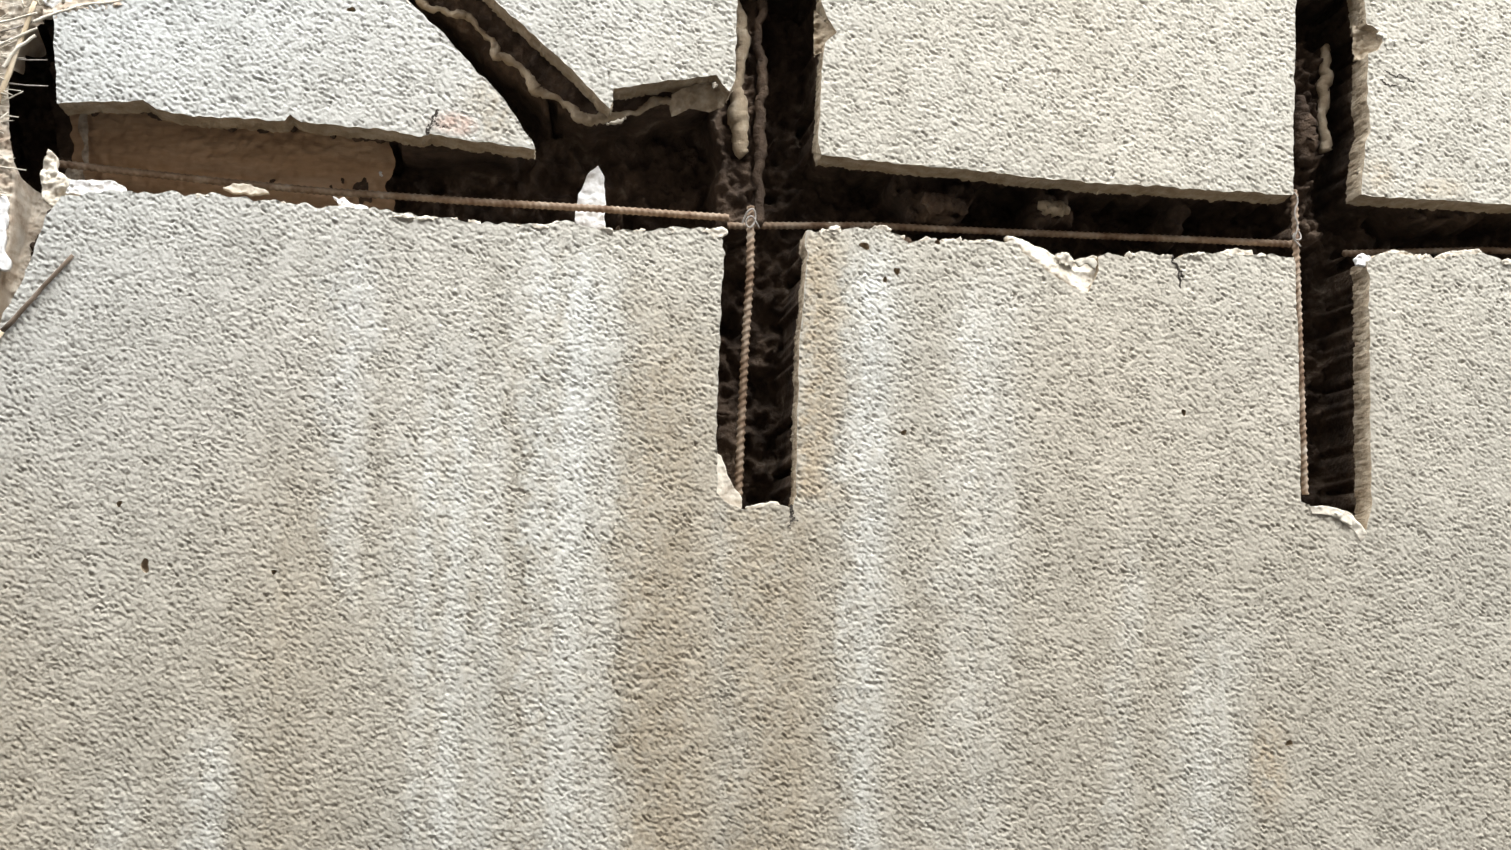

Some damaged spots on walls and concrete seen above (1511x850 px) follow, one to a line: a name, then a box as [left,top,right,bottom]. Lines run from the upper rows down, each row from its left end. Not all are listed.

spalling [1352,25,1396,61]
spalling [0,0,1367,542]
corrosion [797,229,857,509]
spalling [1342,246,1511,265]